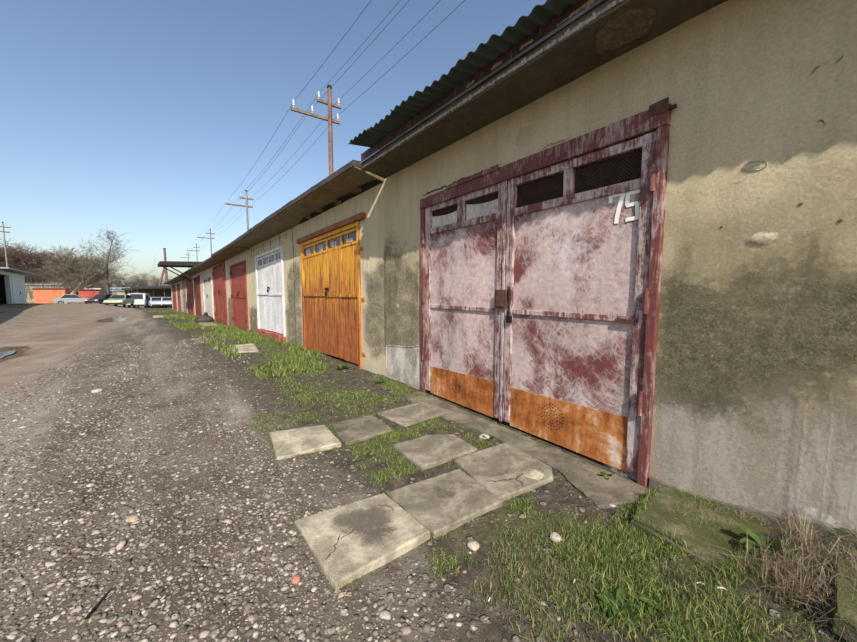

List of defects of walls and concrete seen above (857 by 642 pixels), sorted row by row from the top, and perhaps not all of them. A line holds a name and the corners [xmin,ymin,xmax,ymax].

damp [286,264,302,346]
damp [365,247,420,356]
damp [650,257,857,531]